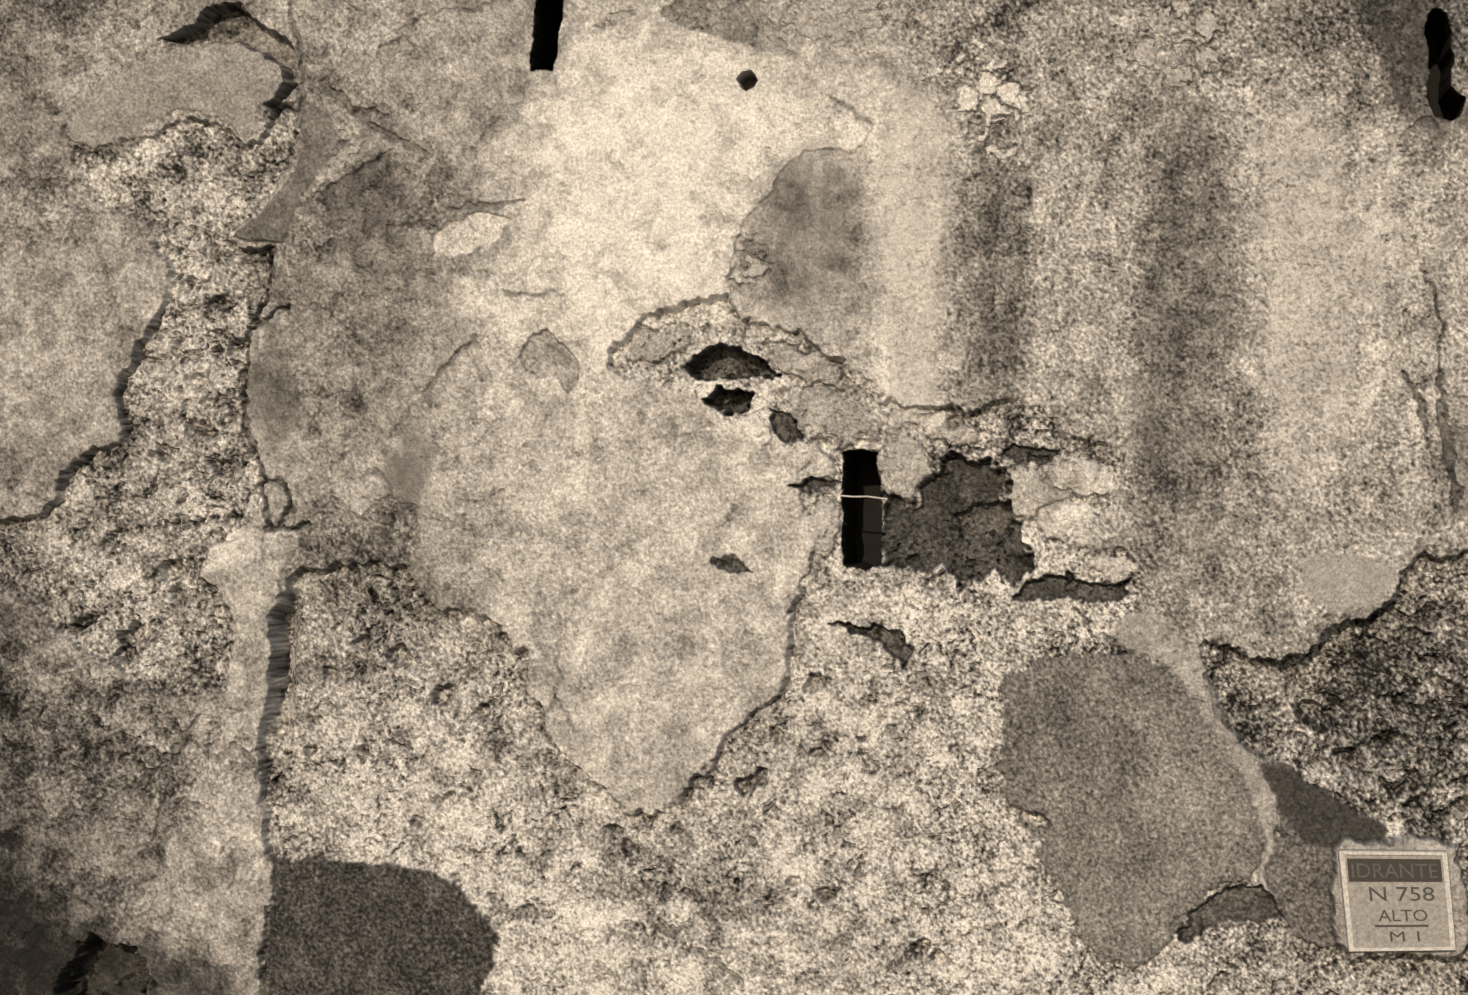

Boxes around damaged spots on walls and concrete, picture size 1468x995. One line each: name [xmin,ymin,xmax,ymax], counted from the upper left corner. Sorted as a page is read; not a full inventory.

crack [284,0,430,212]
crack [396,0,563,35]
flaking render [941,23,1042,178]
spalling [0,41,339,698]
crack [1402,271,1466,514]
spalling [257,233,1468,995]
hole [55,932,158,995]